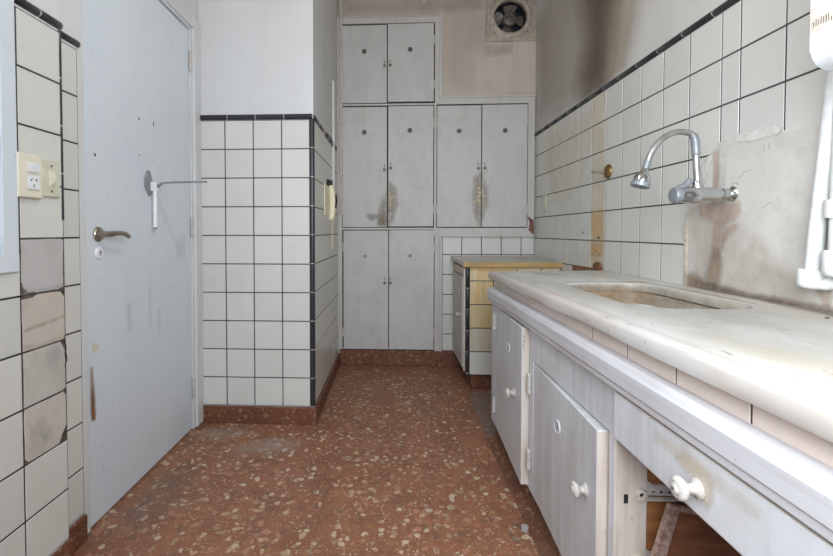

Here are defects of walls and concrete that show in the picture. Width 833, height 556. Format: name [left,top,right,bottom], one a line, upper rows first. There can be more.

peeling [683,126,833,311]